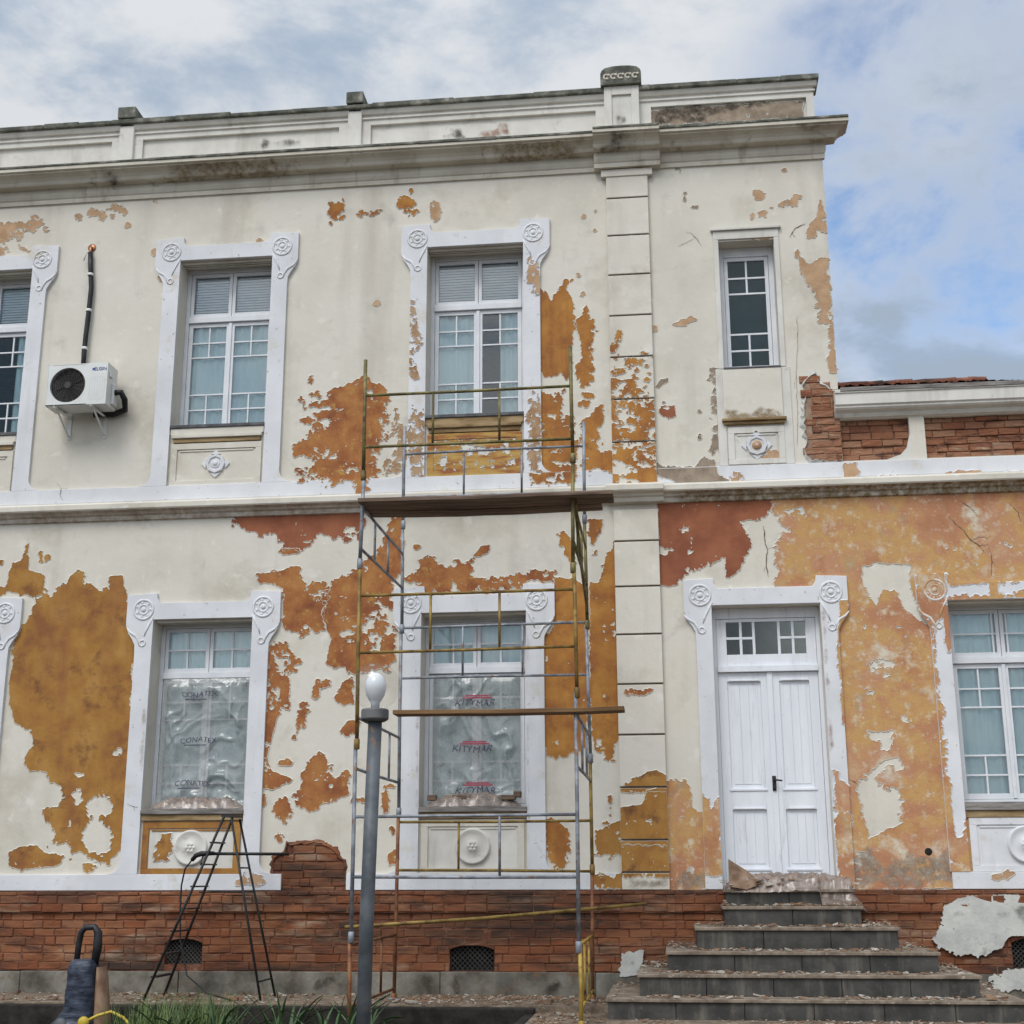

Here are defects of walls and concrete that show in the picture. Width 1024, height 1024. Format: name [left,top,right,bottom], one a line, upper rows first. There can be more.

peeling [0,214,50,256]
peeling [326,198,383,226]
peeling [395,187,443,223]
peeling [291,255,745,493]
flaking render [793,199,861,477]
crack [949,500,994,577]
peeling [0,543,134,874]
peeling [231,513,654,891]
peeling [656,492,1024,890]
peeling [594,769,722,890]